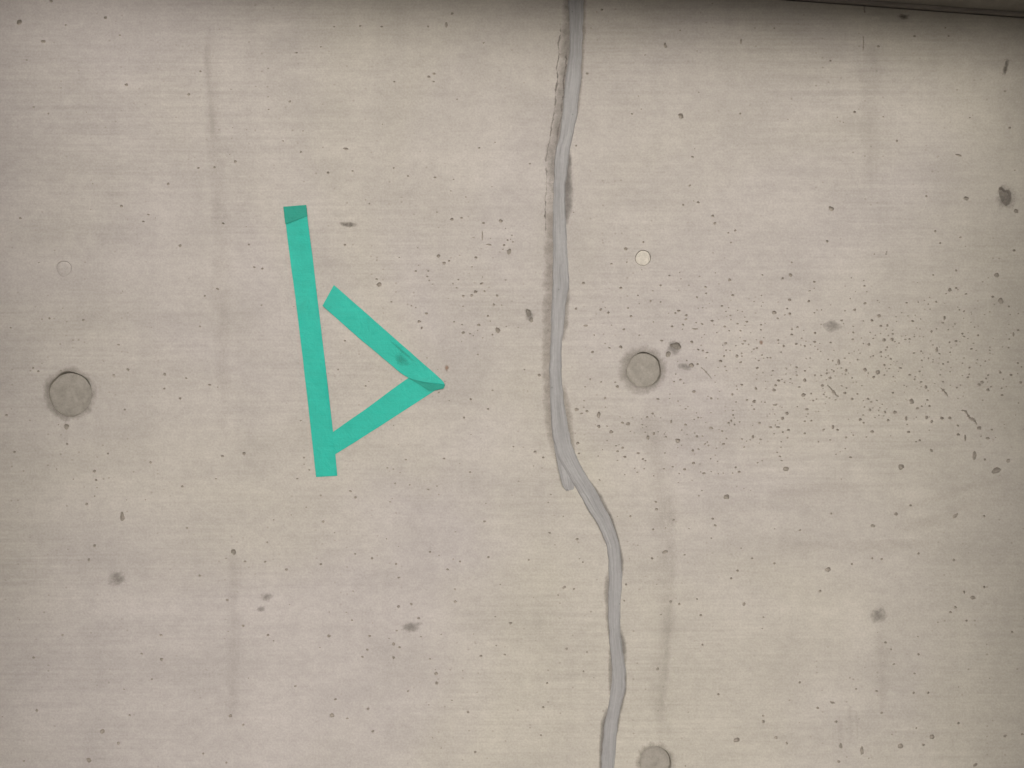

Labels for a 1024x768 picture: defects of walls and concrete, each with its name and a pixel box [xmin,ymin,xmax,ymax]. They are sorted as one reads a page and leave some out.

crack [549,0,626,768]